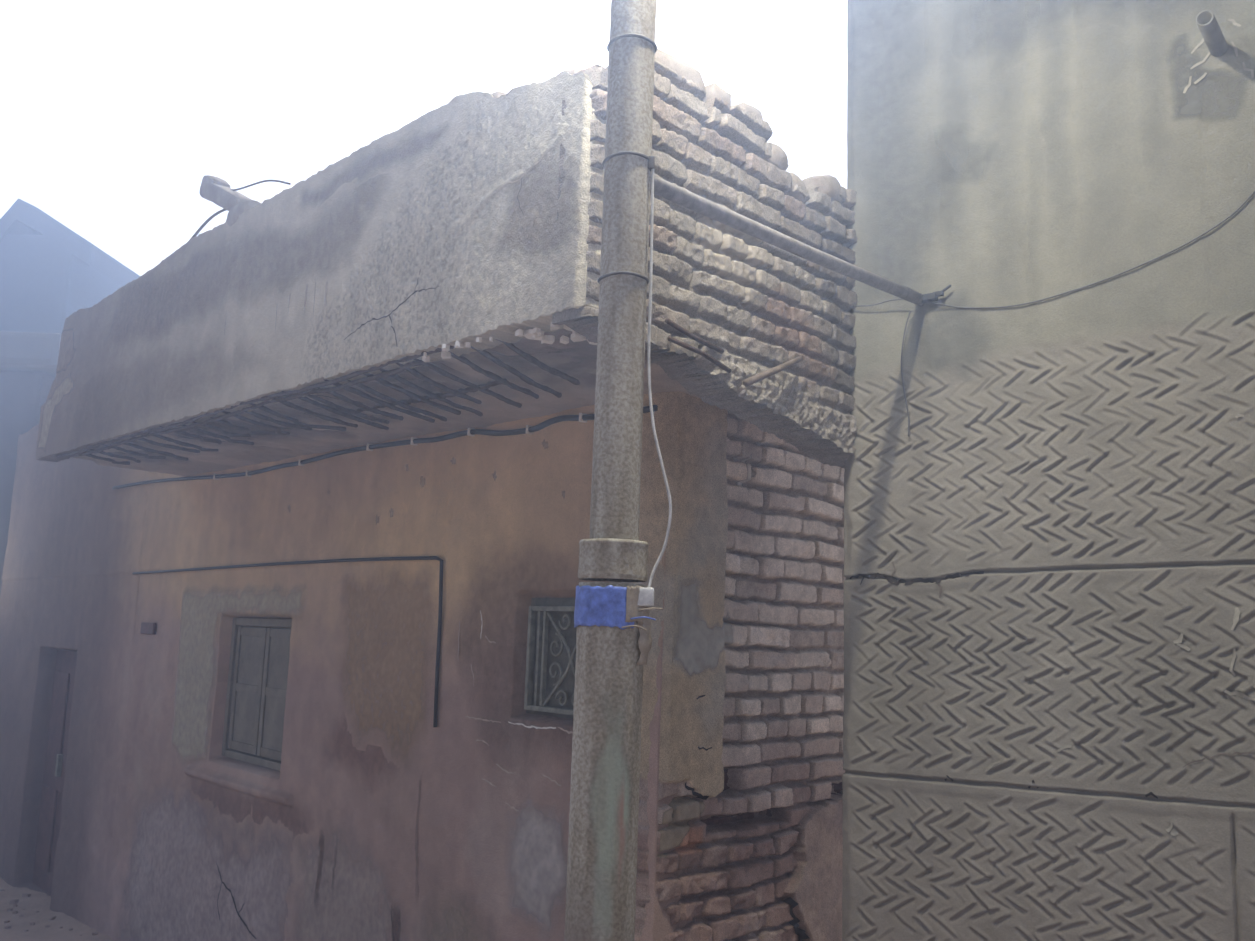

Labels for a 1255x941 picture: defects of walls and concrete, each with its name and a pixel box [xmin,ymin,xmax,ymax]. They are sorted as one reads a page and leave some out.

crack [344,269,438,344]
spalling [665,318,731,373]
spalling [700,809,772,825]
crack [216,862,256,939]
flaking render [122,793,394,941]
crack [783,897,809,941]